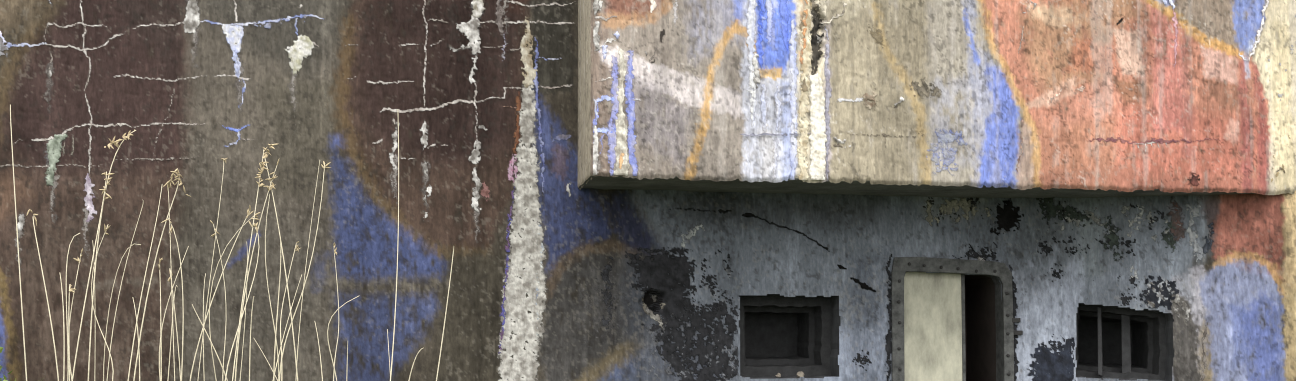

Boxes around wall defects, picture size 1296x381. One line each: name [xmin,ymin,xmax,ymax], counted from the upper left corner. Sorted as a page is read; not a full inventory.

peeling [0,31,8,56]
crack [0,0,323,168]
damp [450,0,509,83]
crack [348,0,617,121]
spalling [593,0,616,51]
crack [740,0,923,181]
damp [468,123,490,239]
damp [1036,172,1214,282]